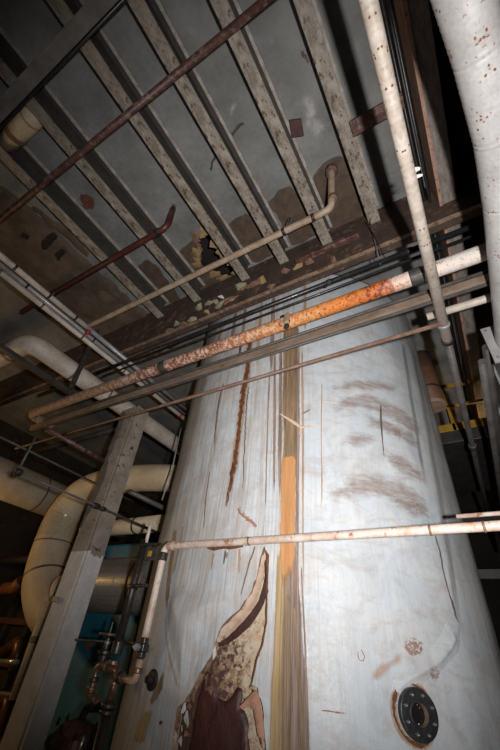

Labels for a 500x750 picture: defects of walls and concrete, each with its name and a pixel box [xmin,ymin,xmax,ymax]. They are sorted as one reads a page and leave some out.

peeling [0,186,147,344]
damp [229,214,273,262]
damp [269,187,316,245]
peeling [281,258,314,274]
damp [313,156,366,231]
spalling [109,226,276,367]
corrosion [189,346,309,750]
corrosion [405,638,422,656]
peeling [172,687,195,746]
corrosion [391,689,432,749]